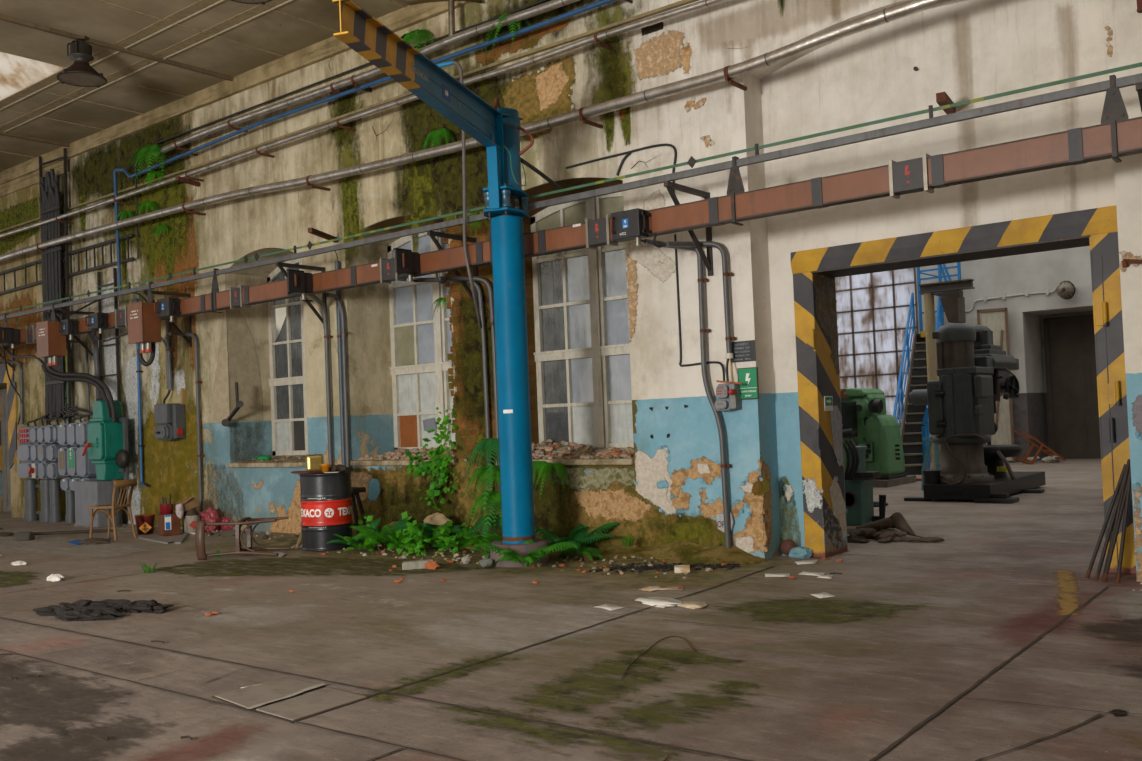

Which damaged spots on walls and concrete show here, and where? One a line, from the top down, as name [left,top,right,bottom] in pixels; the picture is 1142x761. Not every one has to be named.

flaking render [634,22,693,80]
flaking render [501,56,576,141]
damp [602,107,631,151]
damp [342,181,359,268]
damp [119,227,127,281]
peeling [1131,394,1142,440]
flaking render [269,479,302,534]
flaking render [533,405,849,554]
spalling [1132,482,1142,582]